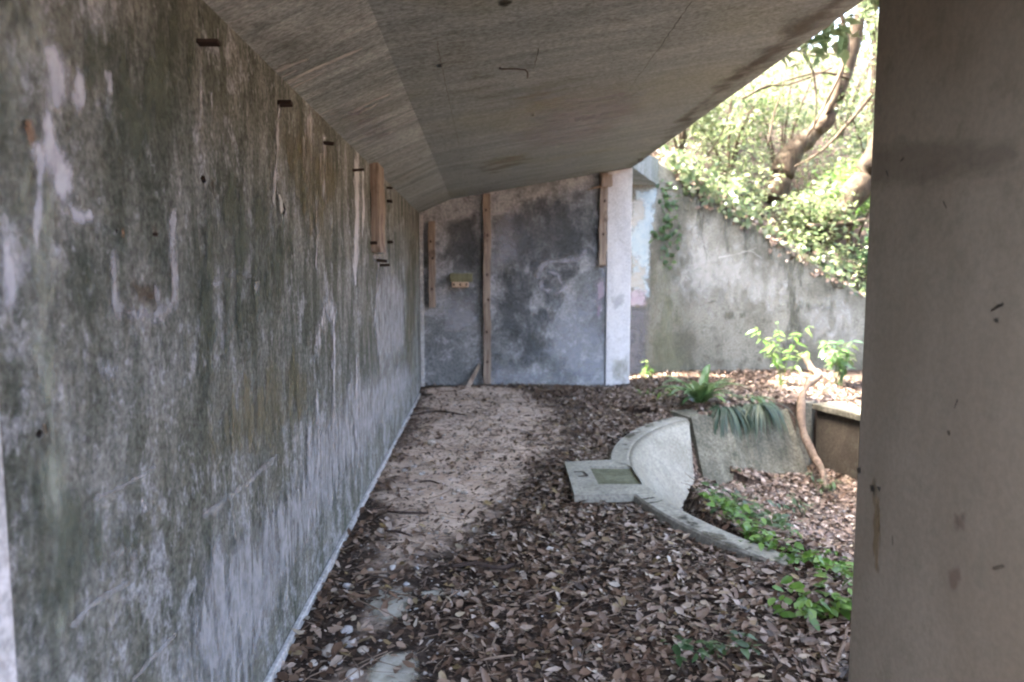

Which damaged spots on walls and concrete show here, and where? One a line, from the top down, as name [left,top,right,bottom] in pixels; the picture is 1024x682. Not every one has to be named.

leakage [273,106,283,213]
leakage [492,192,603,385]